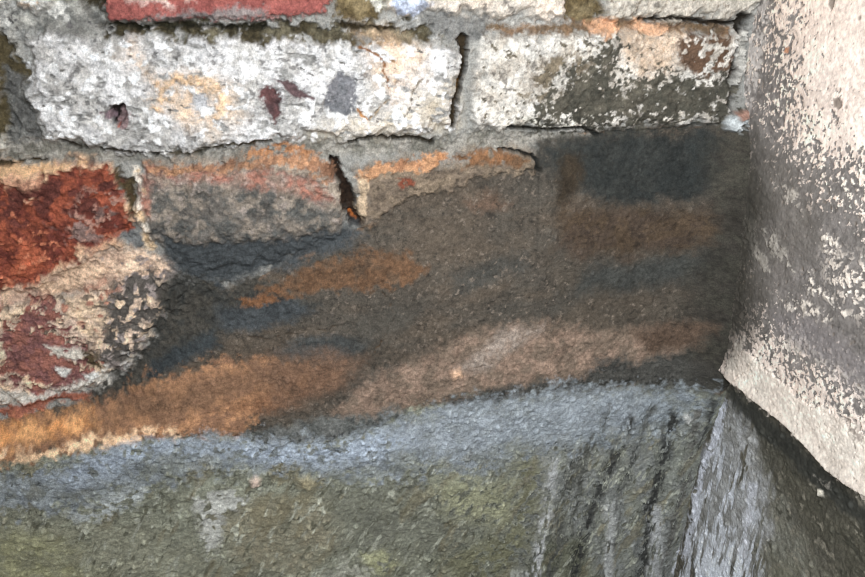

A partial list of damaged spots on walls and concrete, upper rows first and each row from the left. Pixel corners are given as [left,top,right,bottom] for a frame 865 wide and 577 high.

crack [0,138,278,168]
crack [105,19,269,33]
crack [328,19,471,225]
water stain [502,23,742,209]
spalling [0,156,340,417]
water stain [82,175,427,399]
water stain [567,98,865,577]
water stain [0,374,724,577]